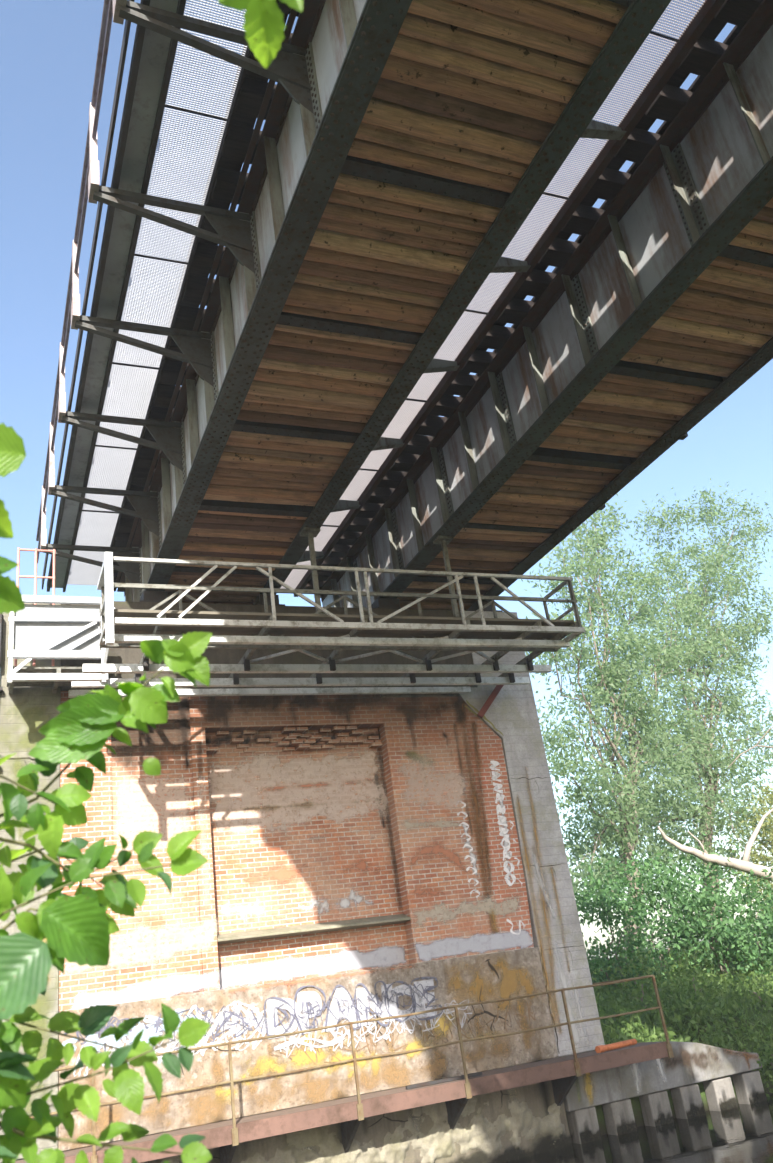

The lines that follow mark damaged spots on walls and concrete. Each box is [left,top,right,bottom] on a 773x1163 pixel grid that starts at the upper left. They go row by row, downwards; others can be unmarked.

peeling [116,778,188,850]
peeling [201,726,386,843]
rust [517,784,539,878]
rust [450,868,561,1033]
crack [468,986,508,1039]
damp [450,1128,602,1163]